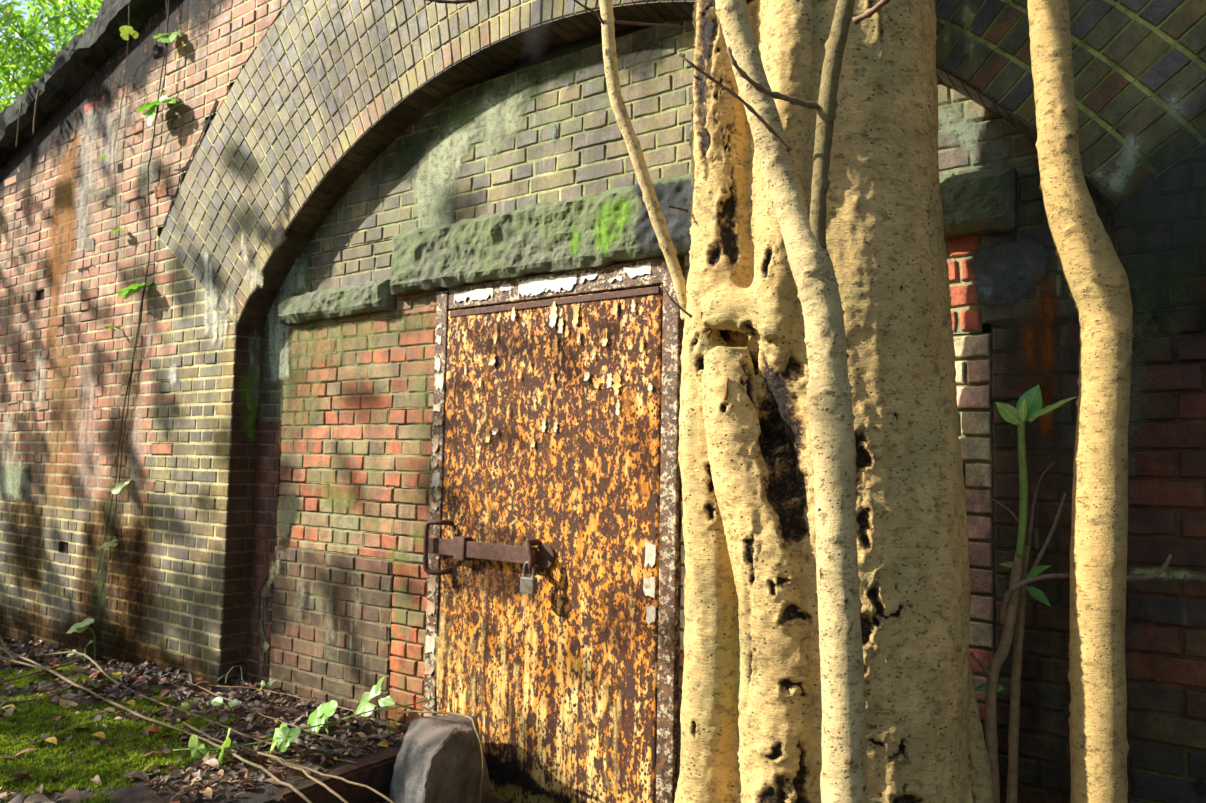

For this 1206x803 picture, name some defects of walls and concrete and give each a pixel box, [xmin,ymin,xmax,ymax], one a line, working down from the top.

damp [401,138,424,179]
rust [46,137,78,506]
damp [204,251,235,342]
damp [241,230,263,290]
peeling [464,323,497,387]
rust [468,325,532,355]
peeling [530,371,557,447]
peeling [454,262,651,351]
peeling [584,328,622,415]
damp [0,348,212,684]
rust [449,562,538,603]
rust [483,751,570,803]